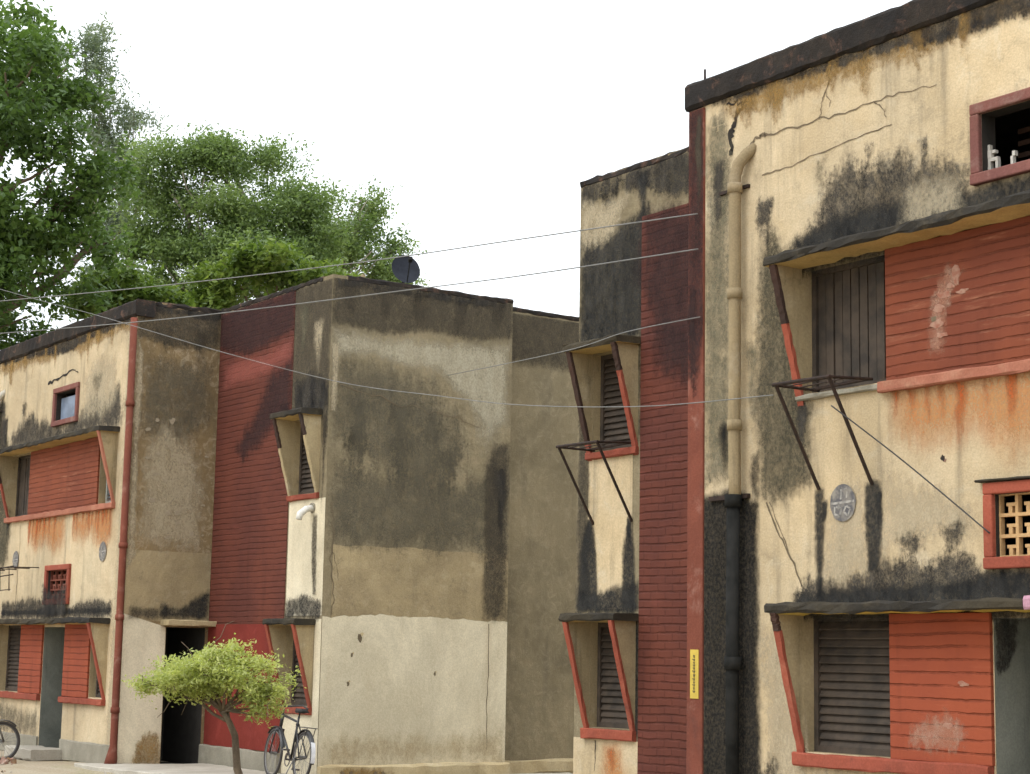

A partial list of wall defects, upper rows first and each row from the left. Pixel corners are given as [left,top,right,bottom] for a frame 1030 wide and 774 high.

crack [727,66,935,176]
water stain [0,459,124,745]
corrosion [28,509,111,547]
water stain [0,0,1030,619]
water stain [576,420,639,735]
water stain [703,489,729,774]
water stain [739,139,1030,774]
peeling [930,265,969,349]
corrosion [893,372,1030,436]